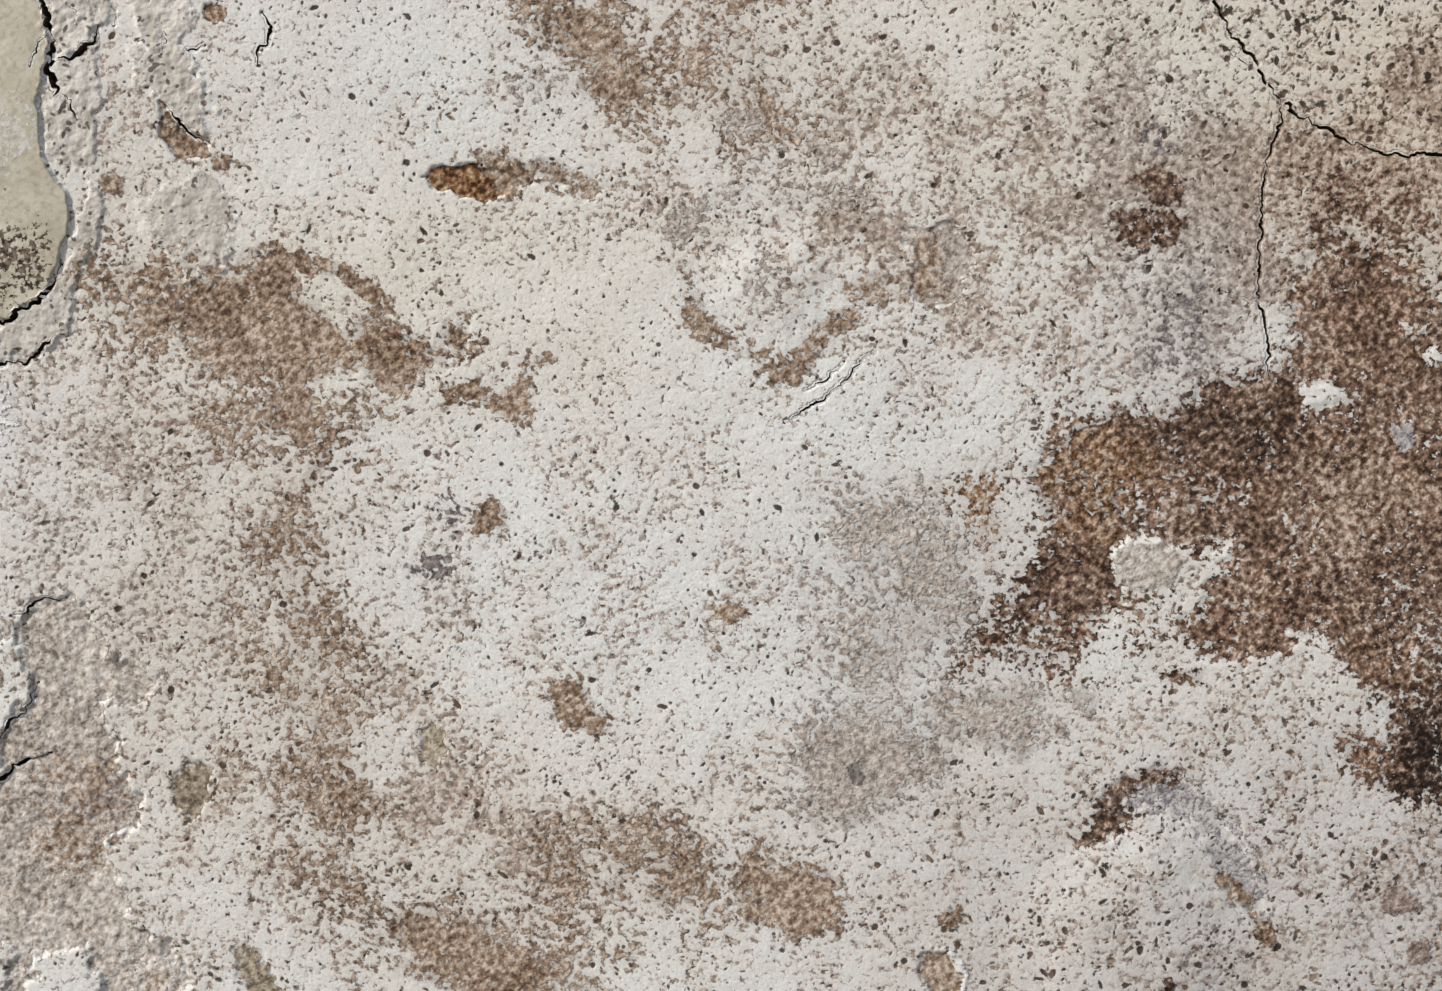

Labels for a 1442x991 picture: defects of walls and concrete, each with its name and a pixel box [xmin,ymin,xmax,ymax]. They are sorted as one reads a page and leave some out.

crack [66,0,206,54]
crack [253,12,276,66]
crack [61,92,86,129]
crack [164,105,210,145]
crack [1207,0,1442,376]
spalling [0,210,52,310]
crack [14,594,67,617]
leakage [58,220,1100,991]
spalling [0,611,23,686]
crack [0,682,53,787]